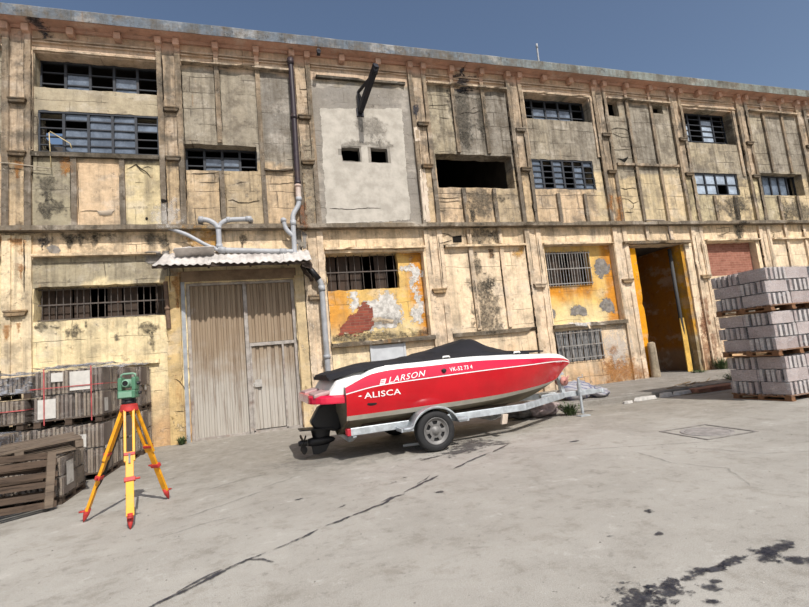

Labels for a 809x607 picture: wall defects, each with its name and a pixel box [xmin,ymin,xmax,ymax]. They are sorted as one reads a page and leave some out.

leakage [446,66,489,148]
leakage [38,158,70,218]
peeling [337,263,425,337]
mould [459,190,509,335]
spalling [568,304,591,328]
spalling [594,257,611,279]
spalling [599,297,616,314]
crack [150,452,490,607]